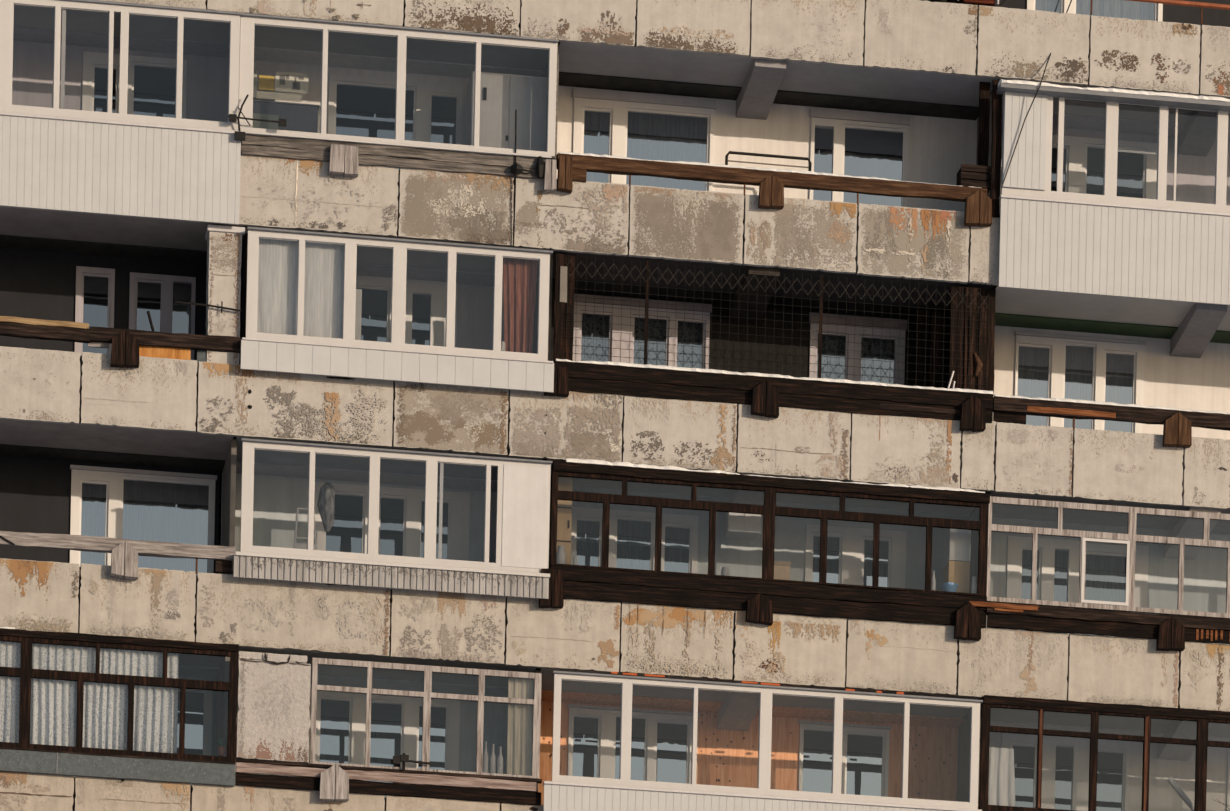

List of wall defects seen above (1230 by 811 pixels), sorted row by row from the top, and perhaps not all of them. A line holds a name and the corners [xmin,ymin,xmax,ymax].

spalling [408,0,519,35]
spalling [982,50,1191,83]
rust [888,206,956,275]
rust [0,559,58,604]
rust [597,605,752,668]
rust [766,619,888,675]
rust [1013,630,1041,696]
rust [1206,644,1230,711]